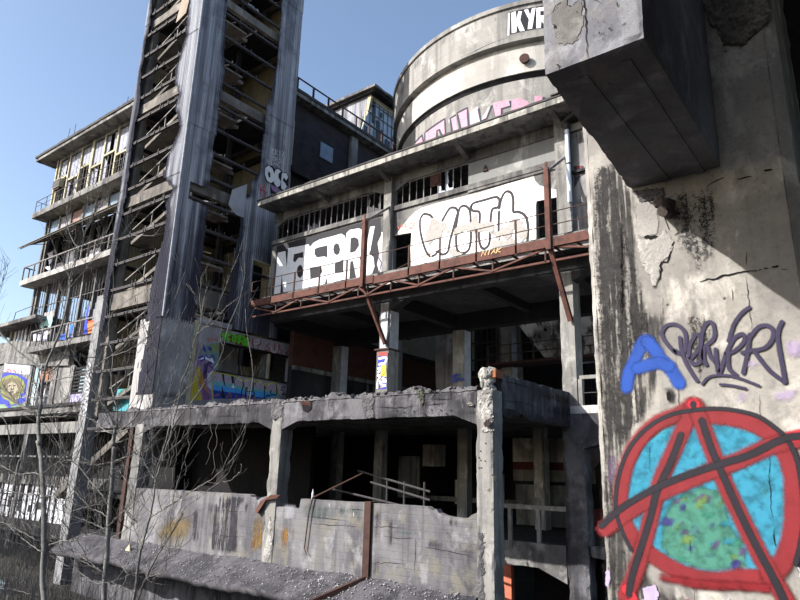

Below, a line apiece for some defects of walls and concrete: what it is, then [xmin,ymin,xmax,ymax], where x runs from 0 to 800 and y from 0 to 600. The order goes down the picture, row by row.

peeling [551,0,596,45]
crack [581,0,589,56]
spalling [702,0,775,47]
spalling [632,187,675,288]
damp [675,190,719,270]
crack [700,252,787,328]
damp [594,164,663,518]
spalling [466,392,494,433]
damp [210,497,247,552]
damp [605,528,631,600]
damp [636,574,651,600]